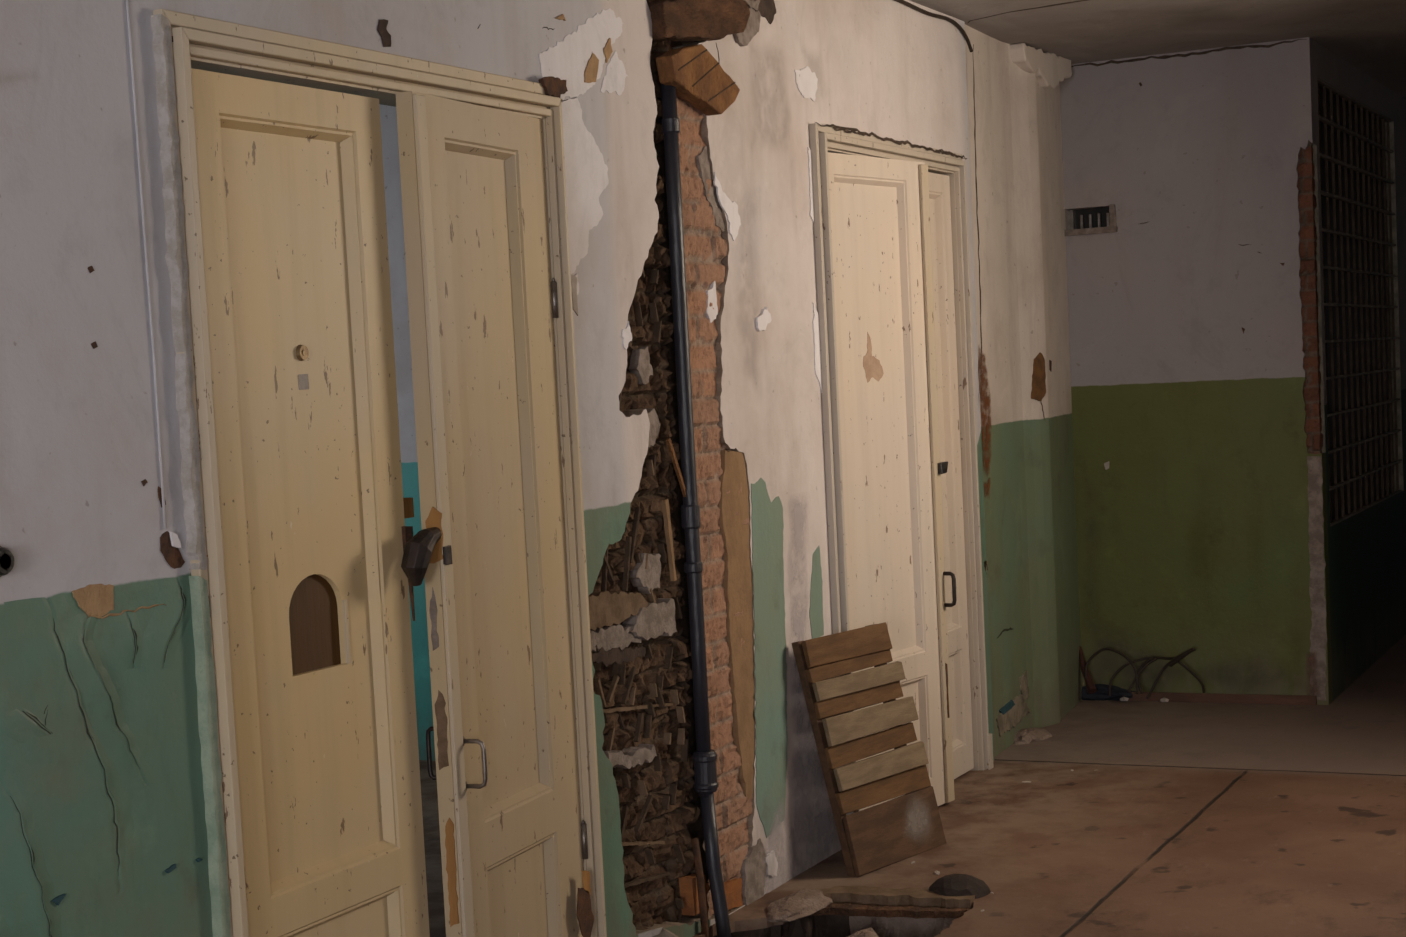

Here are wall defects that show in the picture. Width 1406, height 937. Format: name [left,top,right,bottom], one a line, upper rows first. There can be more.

spalling [733,0,776,47]
peeling [794,66,818,101]
peeling [538,8,628,295]
peeling [812,303,822,393]
peeling [863,332,884,383]
spalling [1280,141,1328,701]
spalling [588,40,788,930]
spalling [72,584,114,619]
peeling [809,546,824,639]
spalling [713,886,975,937]